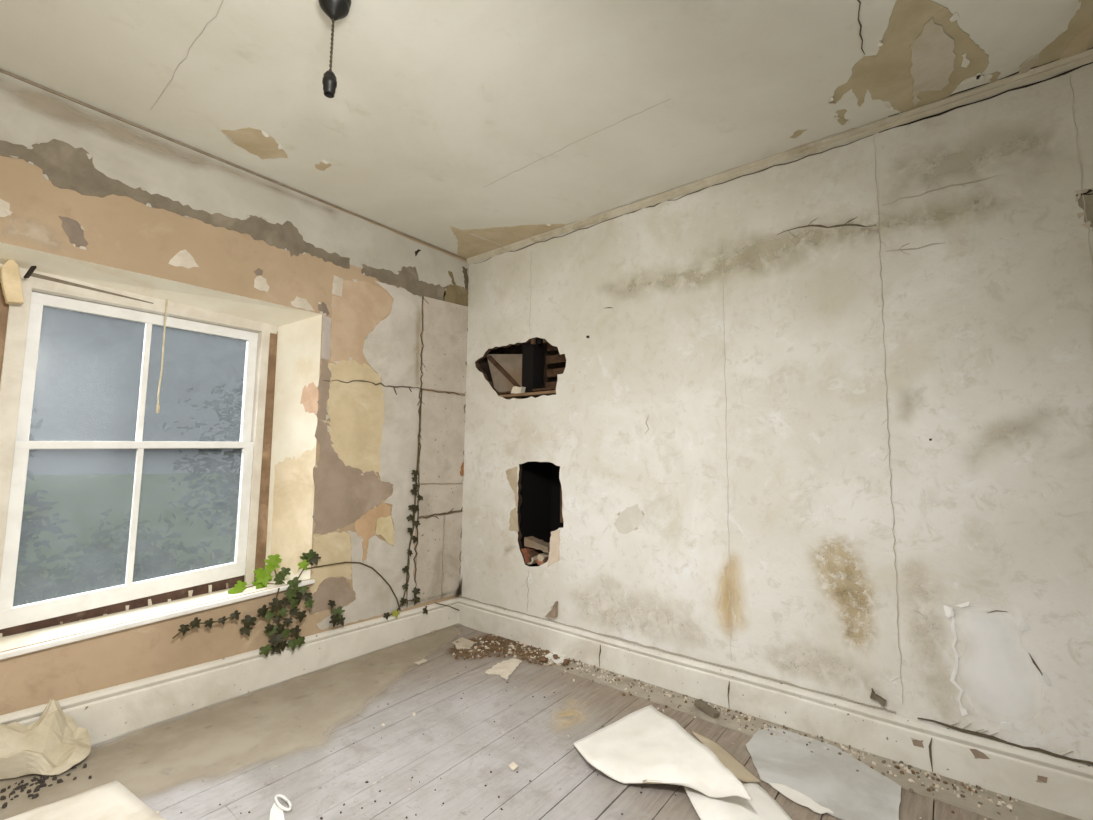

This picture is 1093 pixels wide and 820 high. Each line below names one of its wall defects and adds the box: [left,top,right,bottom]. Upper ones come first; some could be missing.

crack [151,0,224,109]
crack [857,0,865,54]
peeling [828,0,1001,125]
peeling [221,127,288,159]
peeling [450,224,565,259]
peeling [0,139,468,615]